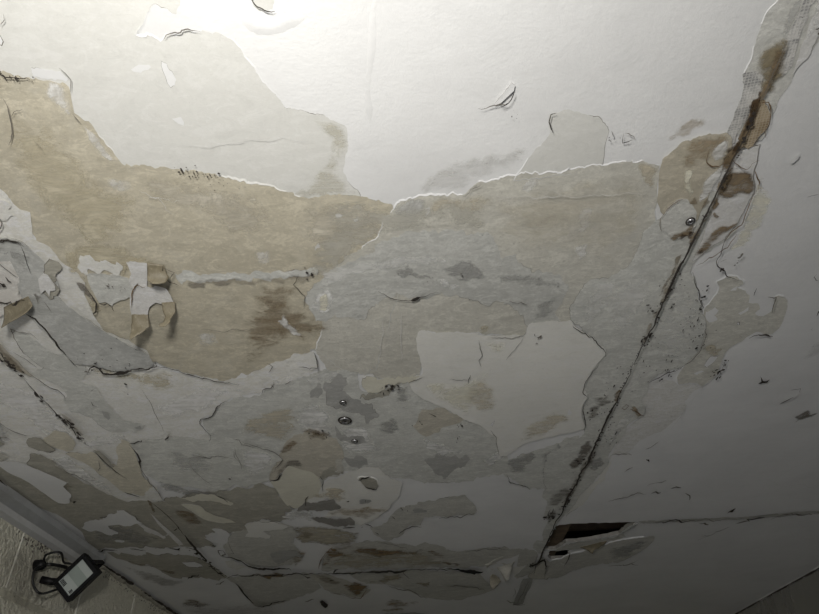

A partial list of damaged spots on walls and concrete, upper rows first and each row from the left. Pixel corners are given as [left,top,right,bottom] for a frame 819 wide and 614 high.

water stain [657,41,787,264]
peeling [727,0,819,144]
peeling [0,0,579,570]
peeling [322,109,788,600]
crack [530,47,785,573]
crack [98,503,484,614]
crack [612,481,819,536]
crack [735,568,819,614]